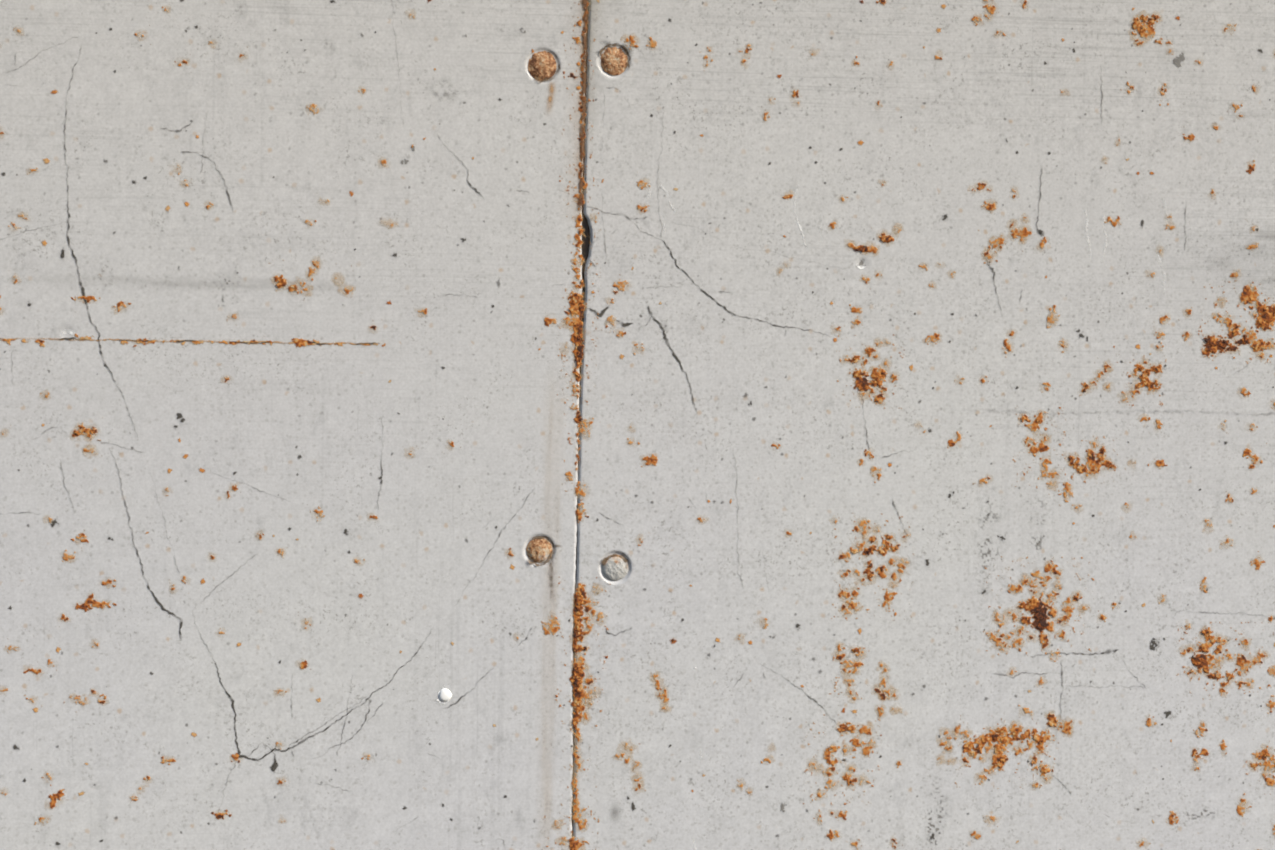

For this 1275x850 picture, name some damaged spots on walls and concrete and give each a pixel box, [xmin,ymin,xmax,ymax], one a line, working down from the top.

crack [62,186,115,381]
corrosion [544,0,644,523]
crack [590,307,694,400]
crack [664,241,795,328]
corrosion [834,304,913,409]
corrosion [1182,270,1275,369]
corrosion [1013,407,1118,524]
crack [137,550,183,635]
corrosion [983,557,1116,662]
crack [216,652,417,771]
corrosion [937,705,1073,788]
corrosion [1176,616,1275,714]